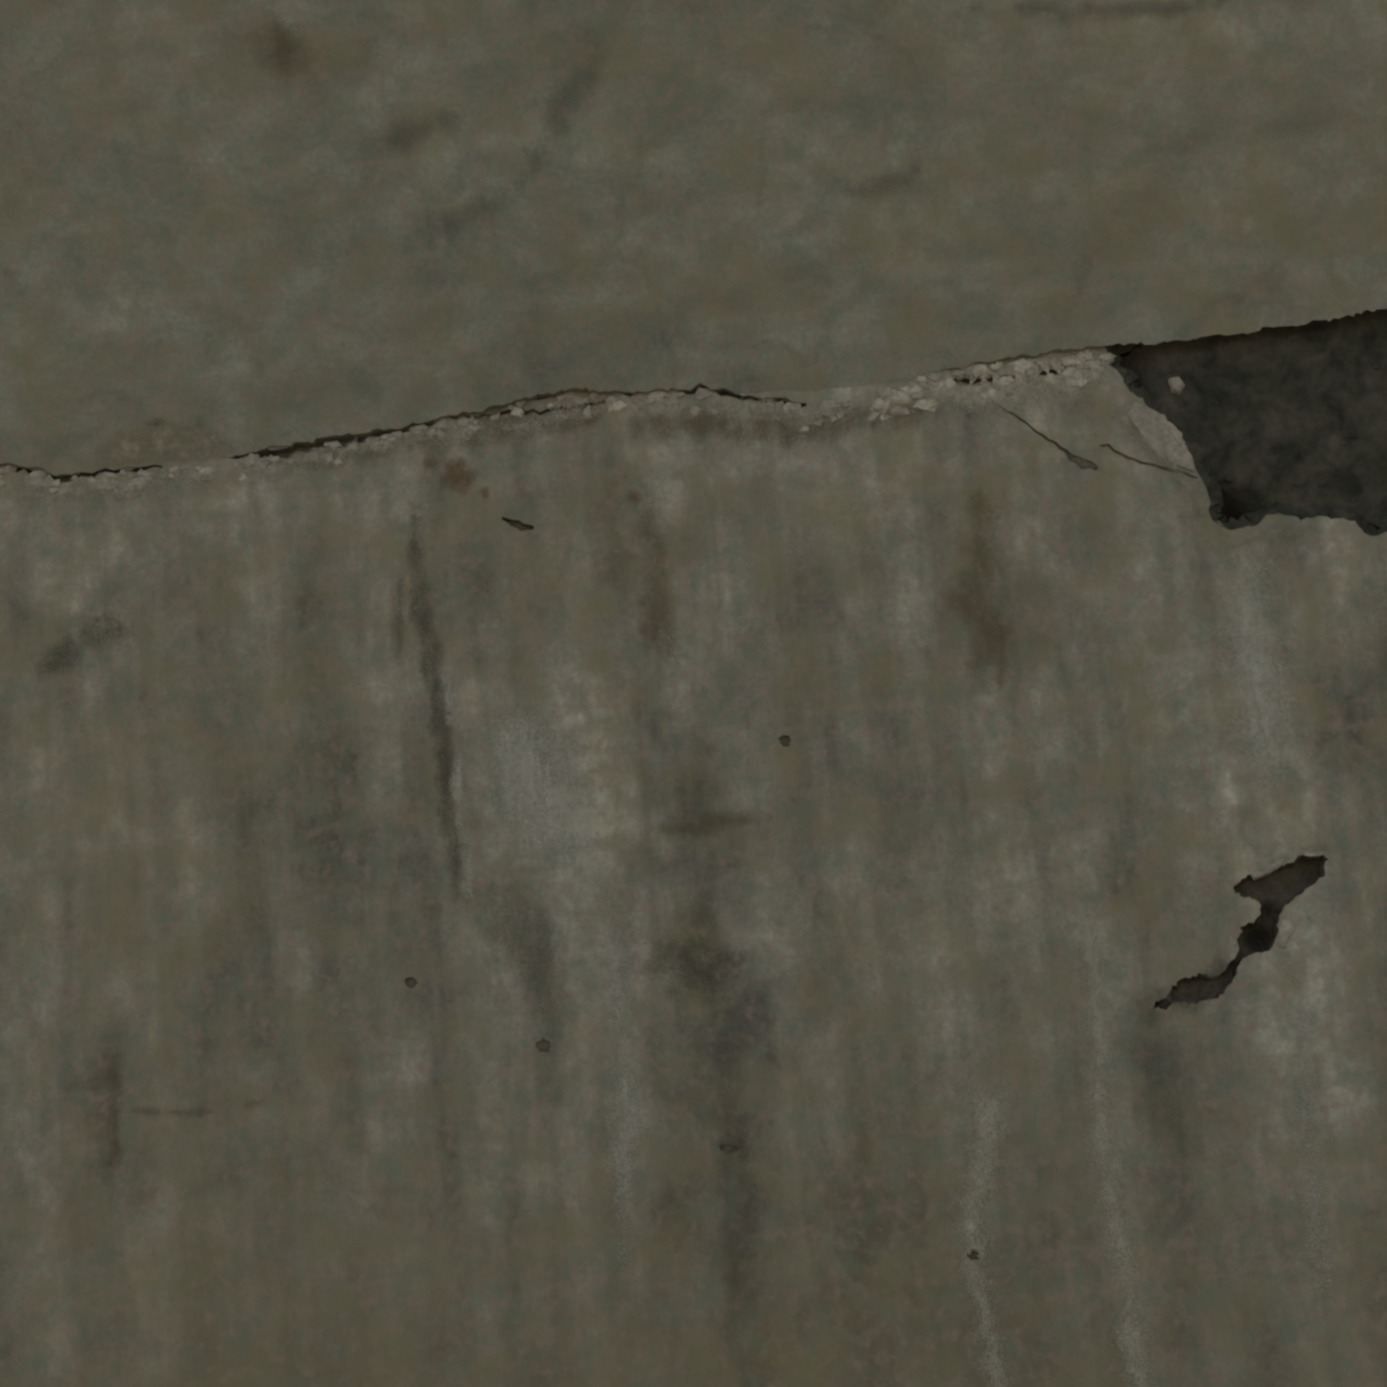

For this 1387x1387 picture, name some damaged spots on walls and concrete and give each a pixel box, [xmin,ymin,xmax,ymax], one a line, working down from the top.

crack [0,387,880,507]
crack [988,398,1198,478]
spalling [870,309,1387,550]
leakage [389,498,649,1278]
spalling [1134,841,1333,1031]